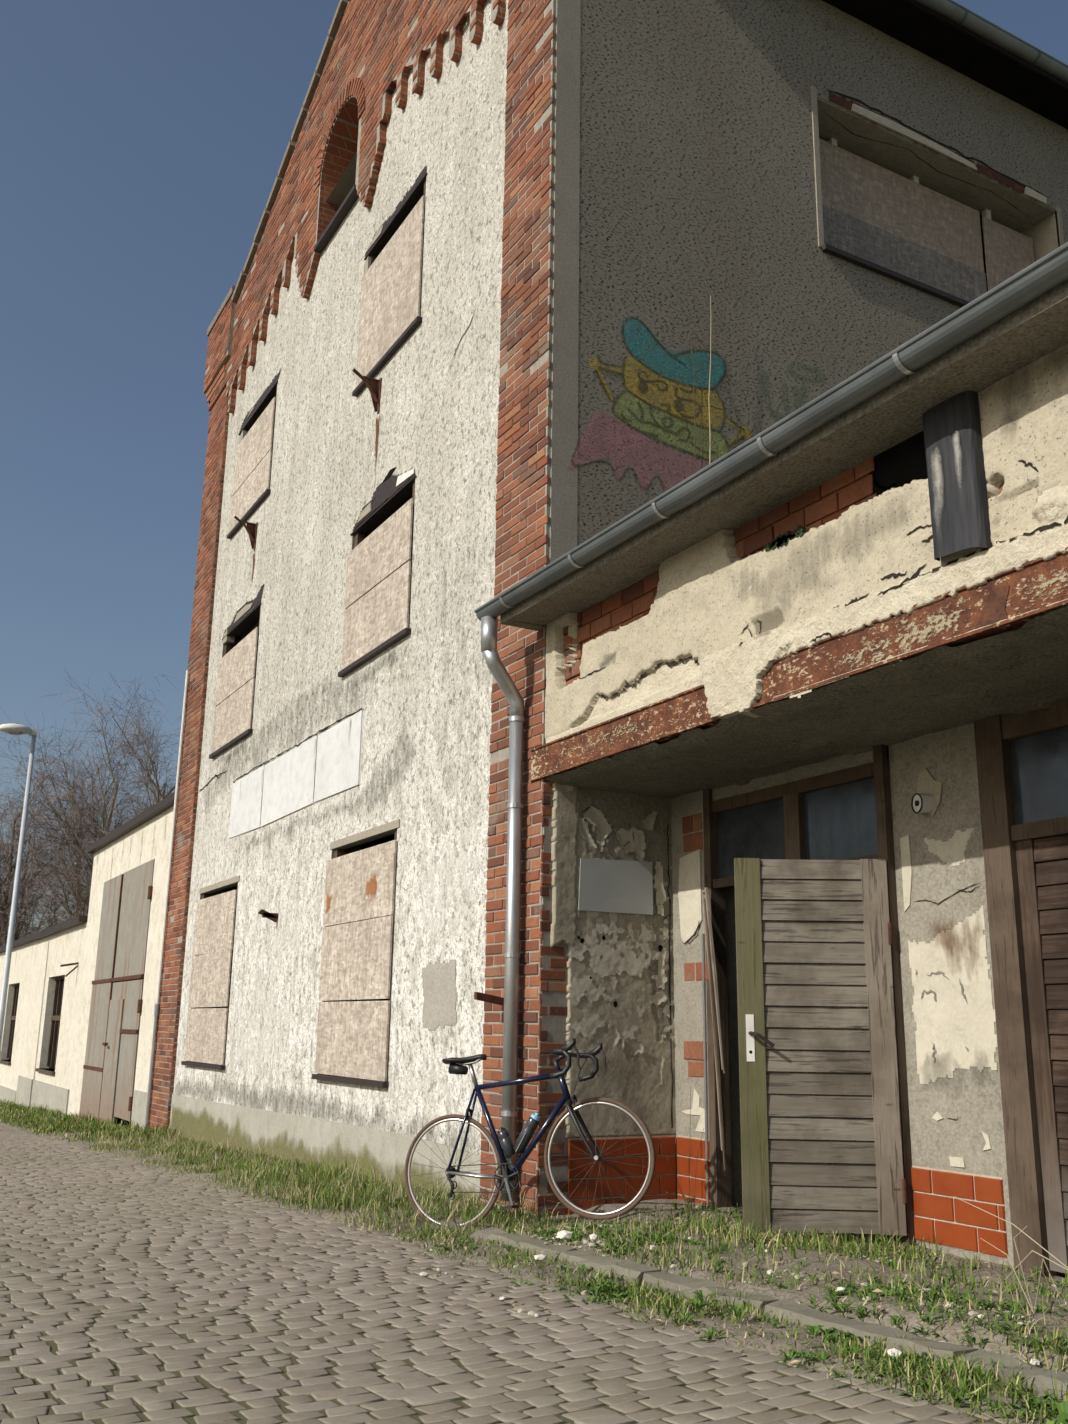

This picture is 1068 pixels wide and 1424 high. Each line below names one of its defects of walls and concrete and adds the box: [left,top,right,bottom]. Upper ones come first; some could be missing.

flaking render [851,103,977,171]
flaking render [733,456,877,558]
crack [1018,460,1038,472]
flaking render [1035,484,1068,521]
flaking render [563,571,659,686]
peeling [830,597,971,674]
crack [810,516,1068,642]
peeling [1022,569,1068,605]
flaking render [565,656,706,760]
peeling [900,828,974,912]
peeling [564,785,709,1132]
peeling [908,906,998,1084]